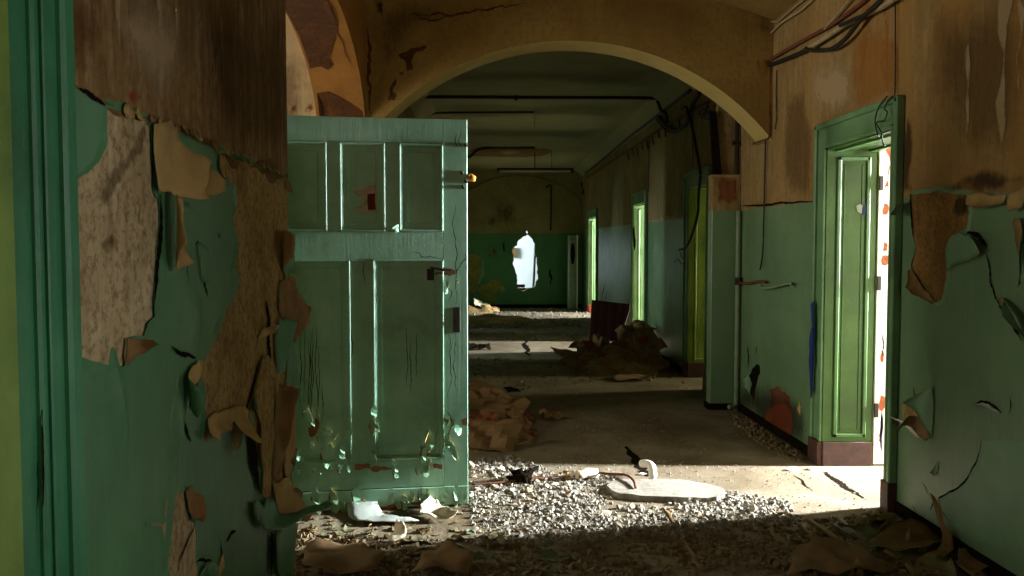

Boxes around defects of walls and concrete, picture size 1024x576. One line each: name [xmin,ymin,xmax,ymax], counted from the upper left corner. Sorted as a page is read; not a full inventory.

crack [411,3,522,22]
flaking render [388,45,427,101]
flaking render [889,186,1024,306]
flaking render [75,85,366,576]
peeling [741,347,760,396]
crack [986,254,1024,341]